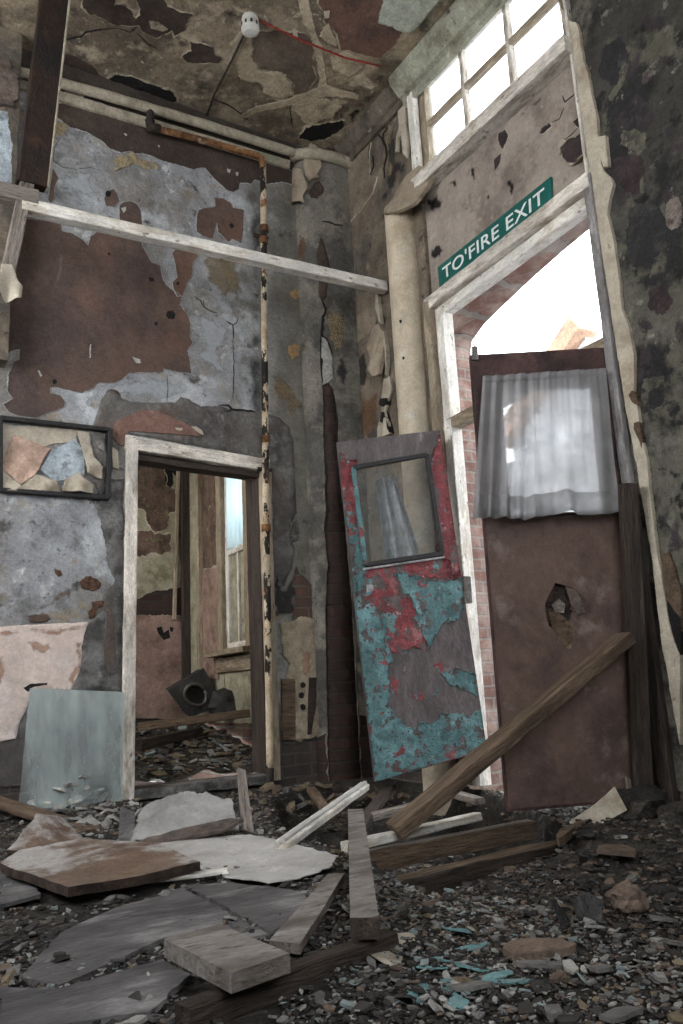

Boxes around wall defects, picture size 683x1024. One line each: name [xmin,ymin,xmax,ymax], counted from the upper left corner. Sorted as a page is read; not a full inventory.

flaking render [64,55,179,103]
peeling [81,0,224,64]
peeling [55,102,292,243]
peeling [249,28,317,96]
flaking render [297,118,346,142]
peeling [317,0,403,59]
peeling [557,117,583,166]
peeling [598,136,667,268]
peeling [2,218,198,419]
crack [195,296,261,414]
flaking render [71,447,181,692]
flaking render [291,337,362,782]